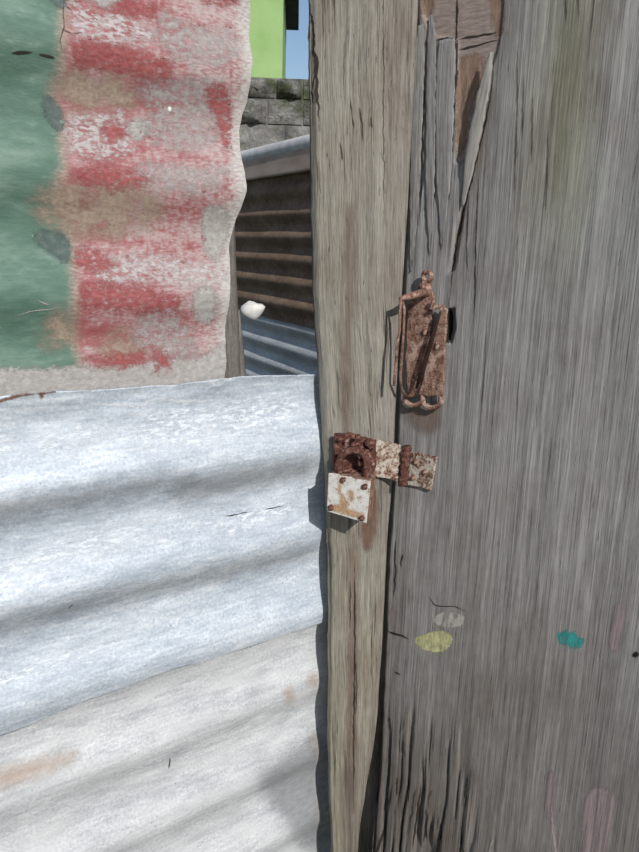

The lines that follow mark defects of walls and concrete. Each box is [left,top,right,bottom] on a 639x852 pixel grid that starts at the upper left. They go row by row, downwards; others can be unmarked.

peeling [42,95,64,136]
peeling [73,0,240,151]
crack [418,66,426,220]
crack [438,0,497,321]
crack [514,51,548,211]
peeling [31,230,221,372]
corrosion [337,434,376,474]
corrosion [362,495,377,549]